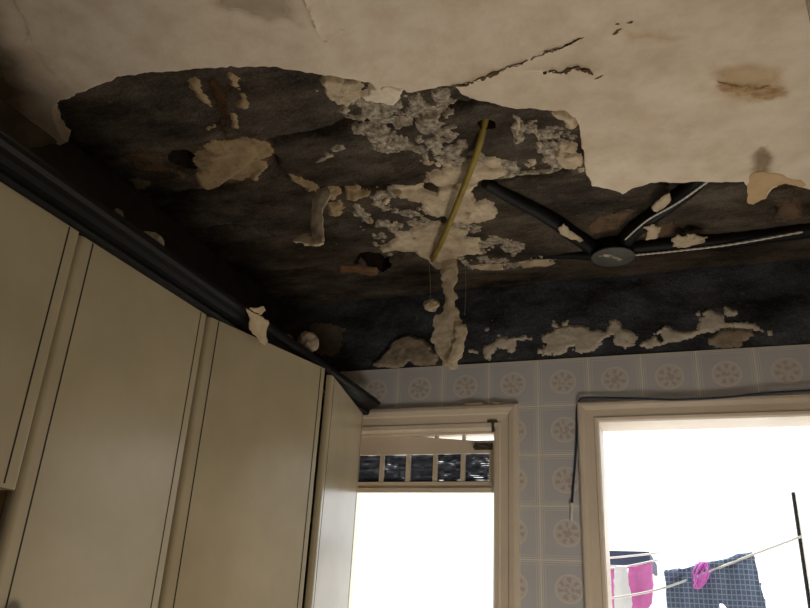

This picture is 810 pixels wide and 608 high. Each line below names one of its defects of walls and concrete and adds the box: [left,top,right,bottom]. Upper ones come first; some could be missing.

crack [451,37,603,87]
water stain [717,81,785,99]
spalling [57,66,810,372]